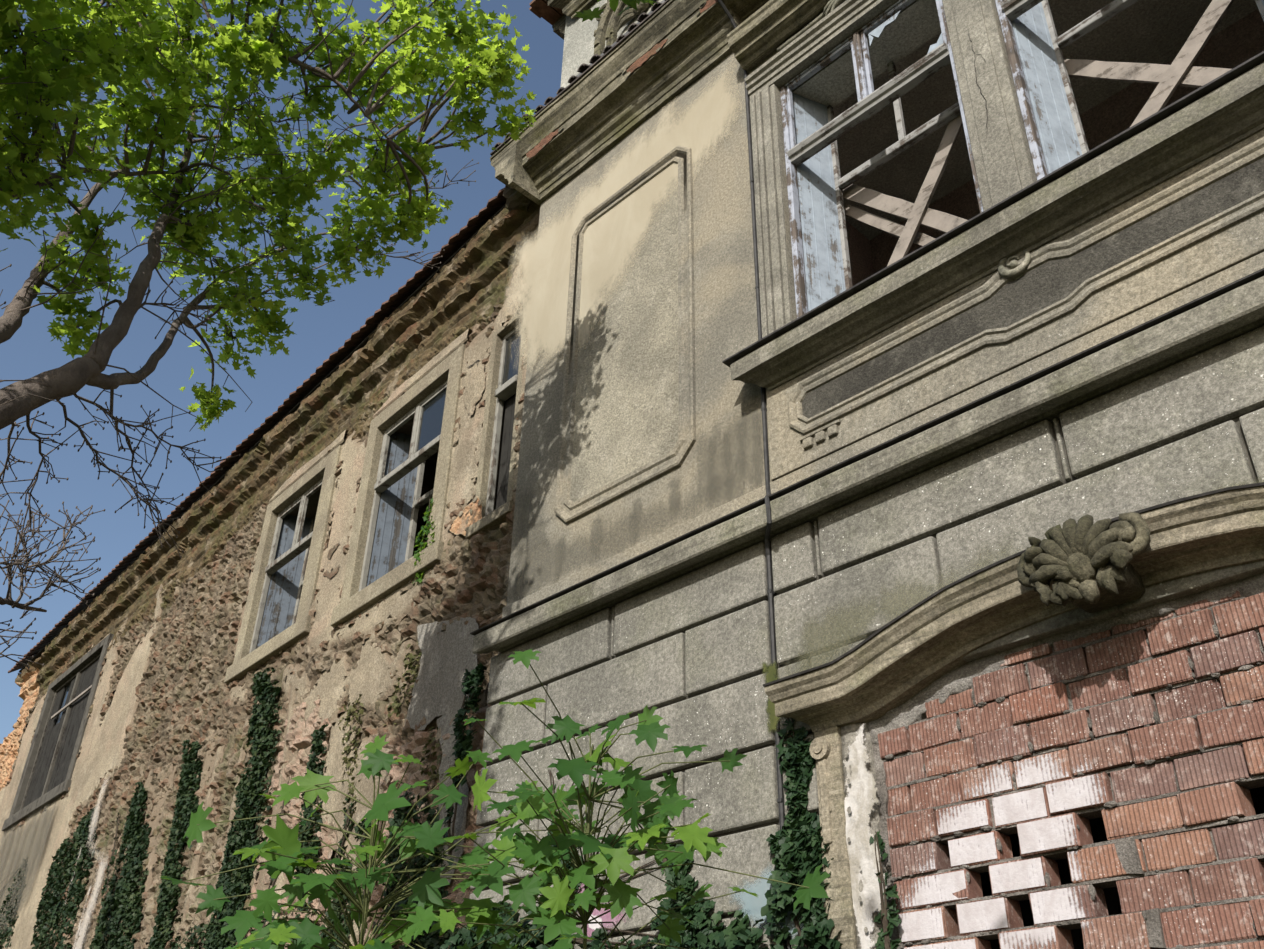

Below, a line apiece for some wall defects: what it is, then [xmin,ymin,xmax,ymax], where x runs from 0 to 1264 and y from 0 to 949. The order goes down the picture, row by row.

flaking render [0,202,540,949]